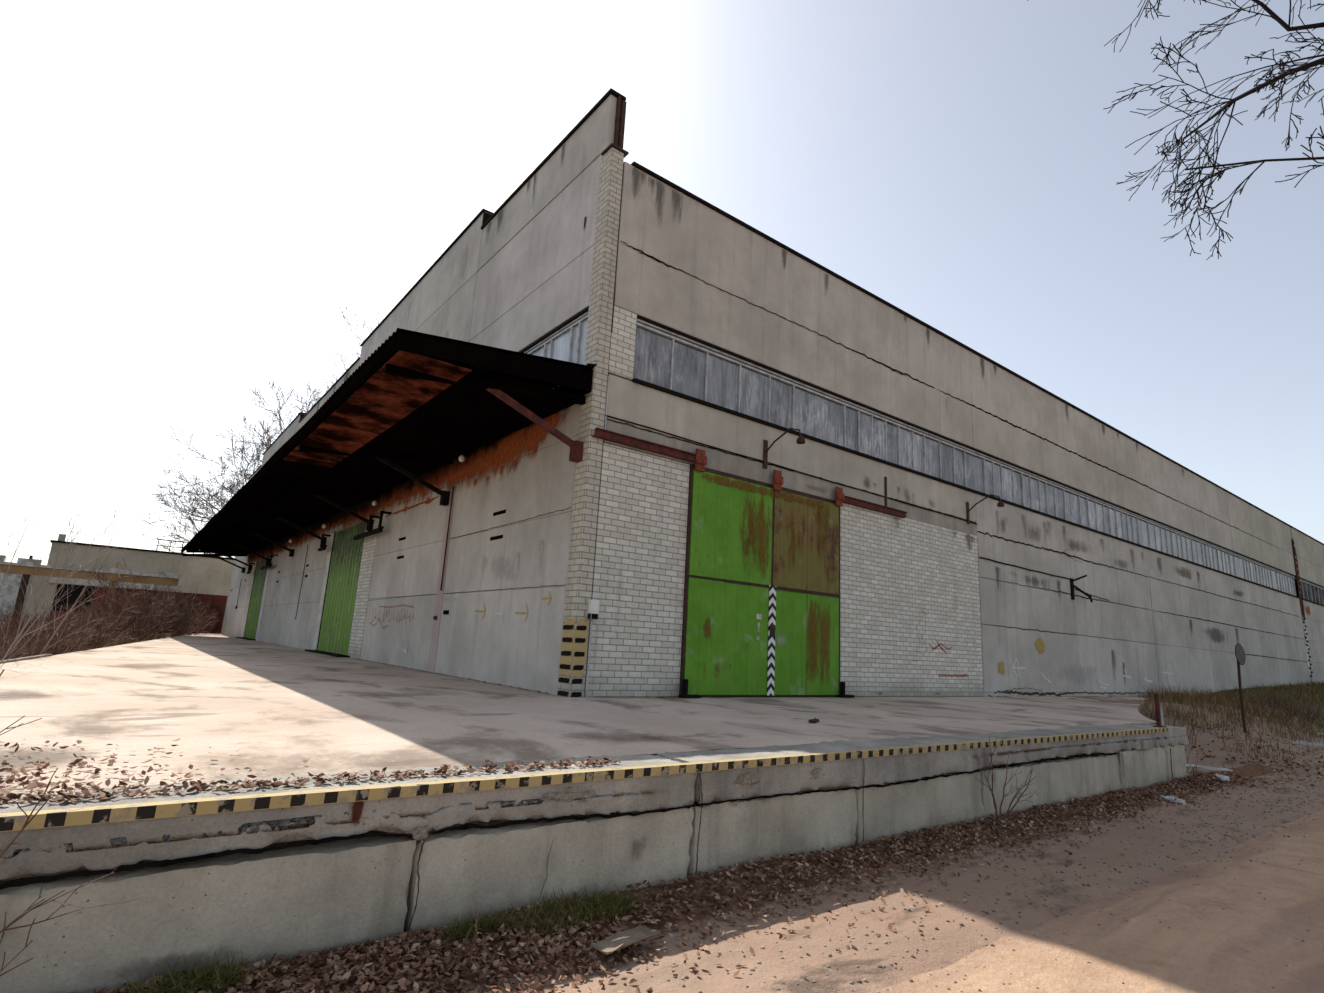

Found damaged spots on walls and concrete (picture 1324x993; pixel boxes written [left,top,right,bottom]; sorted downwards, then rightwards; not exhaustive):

corrosion [248,410,566,564]
crack [451,507,571,539]
corrosion [702,474,830,574]
crack [606,418,1307,697]
corrosion [1291,539,1310,618]
corrosion [808,602,830,680]
crack [0,753,1124,933]